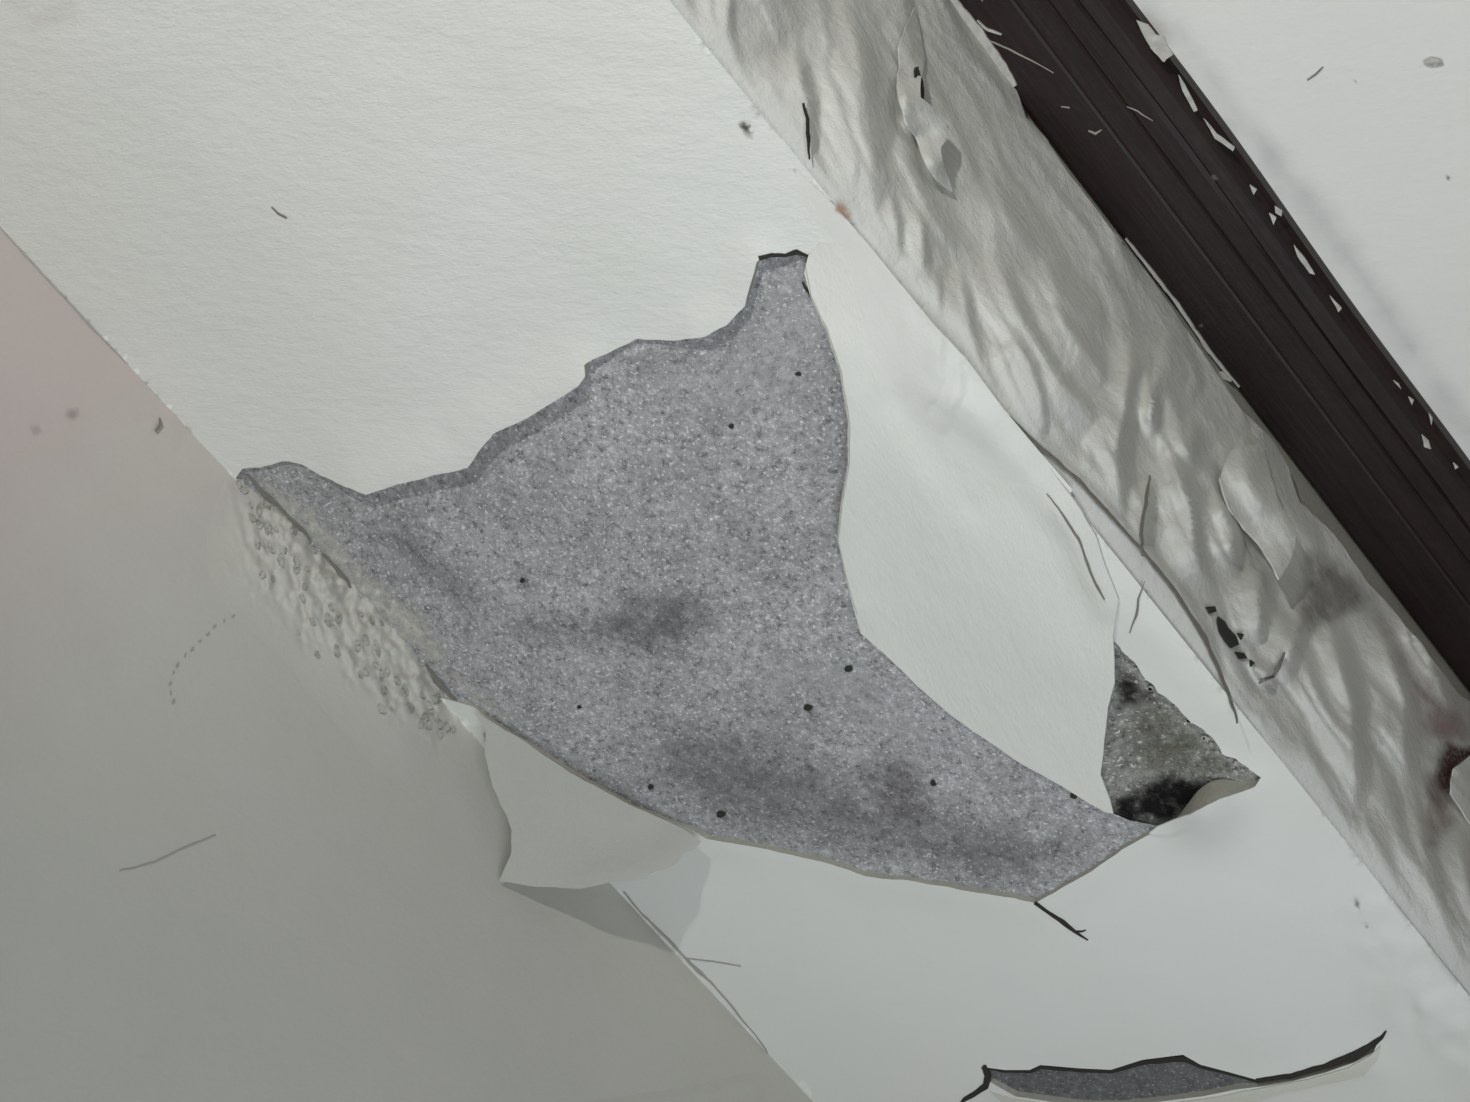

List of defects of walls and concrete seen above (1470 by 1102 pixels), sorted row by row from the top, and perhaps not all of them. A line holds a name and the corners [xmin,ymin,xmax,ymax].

spalling [207,242,1156,903]
peeling [1218,442,1296,580]
spalling [1176,777,1261,818]
crack [623,891,768,1054]
crack [1034,901,1088,941]
spalling [981,1046,1376,1102]